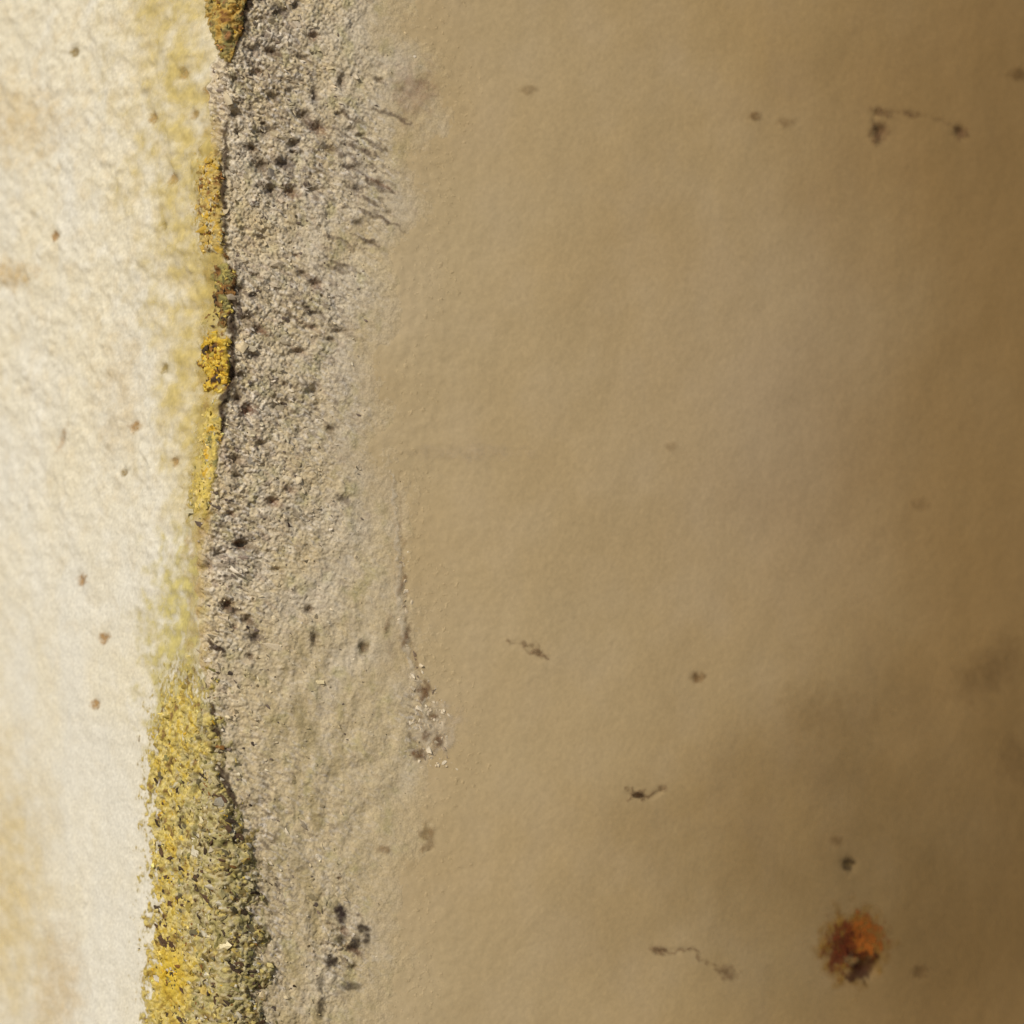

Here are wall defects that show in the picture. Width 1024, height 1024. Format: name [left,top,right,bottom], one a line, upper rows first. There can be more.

damp [139,0,217,209]
damp [162,327,199,410]
spalling [194,0,491,1024]
corrosion [820,910,884,982]